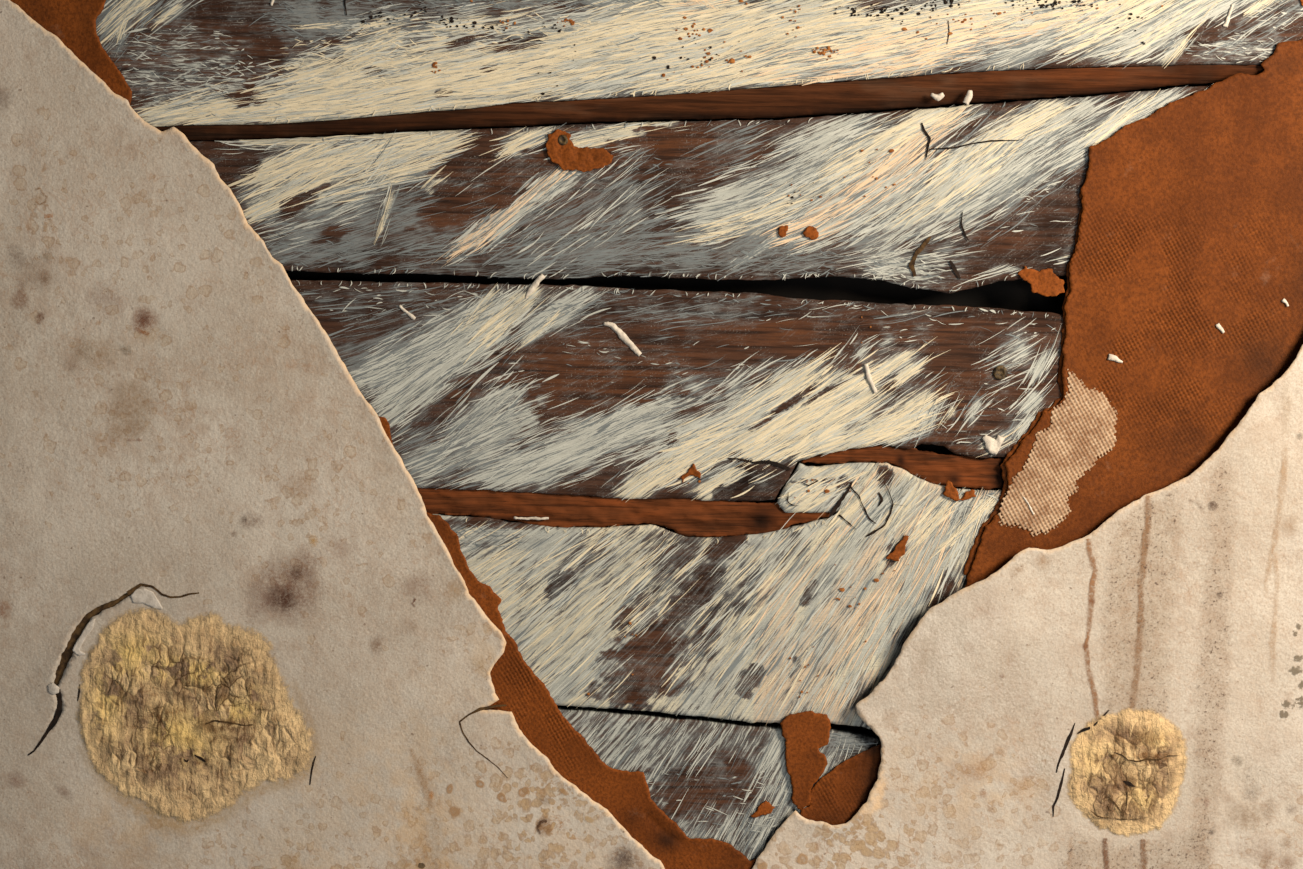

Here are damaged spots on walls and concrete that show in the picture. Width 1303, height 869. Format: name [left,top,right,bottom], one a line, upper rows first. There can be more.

peeling [998,369,1118,536]
crack [28,583,199,756]
peeling [77,608,312,823]
peeling [1068,708,1187,836]